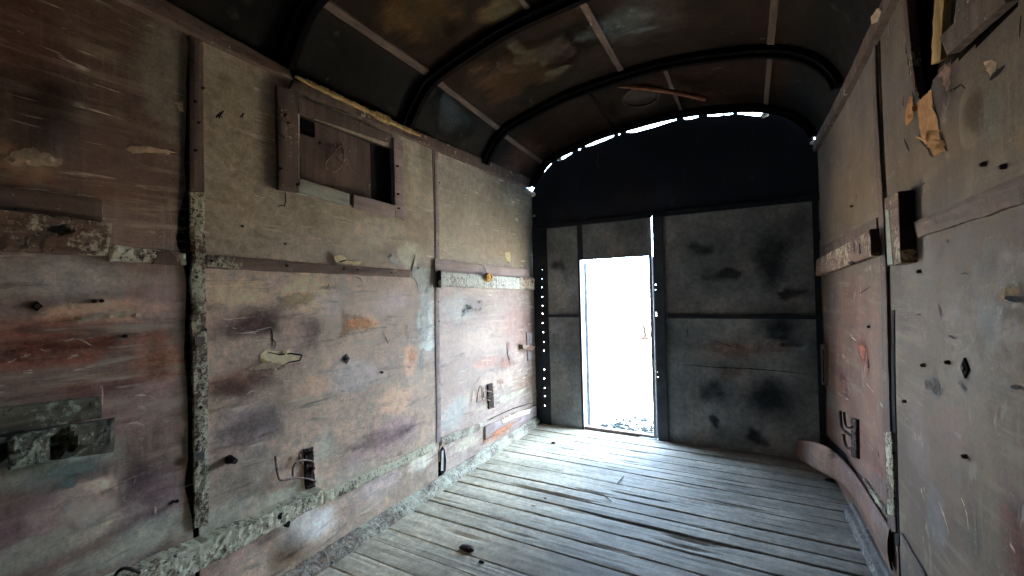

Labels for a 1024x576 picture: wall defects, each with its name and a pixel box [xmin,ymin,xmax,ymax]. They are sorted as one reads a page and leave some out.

peeling [980,60,998,75]
peeling [905,88,947,157]
peeling [3,147,63,168]
peeling [126,145,176,155]
peeling [226,325,303,370]
leakage [754,381,788,412]